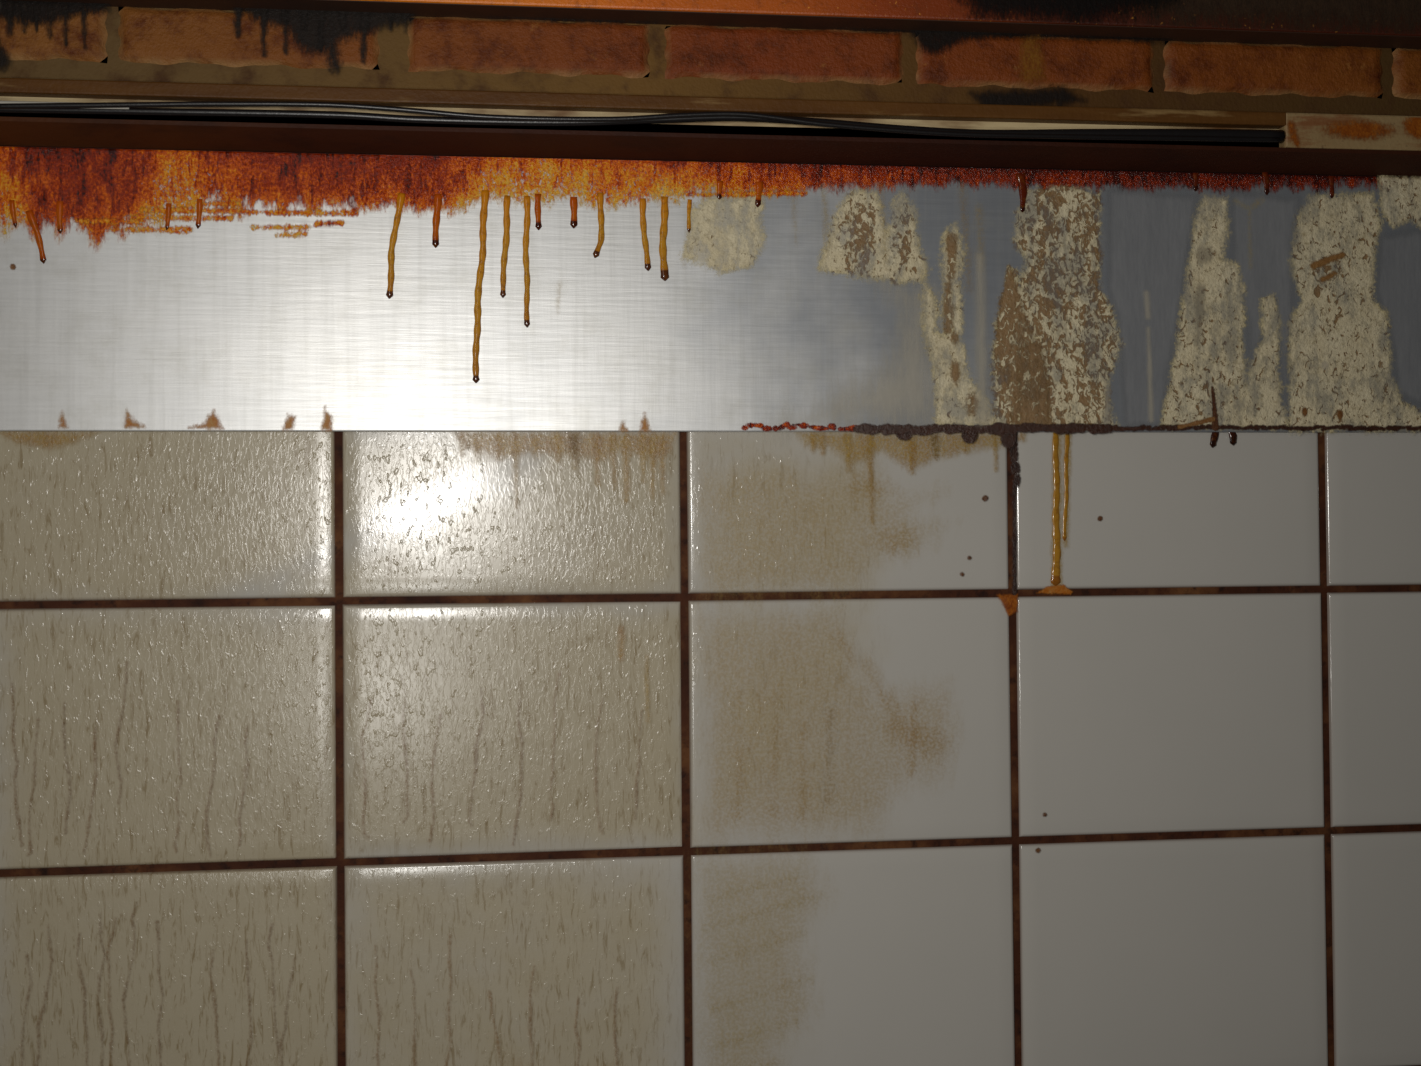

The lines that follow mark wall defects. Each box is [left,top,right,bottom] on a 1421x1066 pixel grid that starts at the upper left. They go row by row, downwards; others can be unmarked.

rust [0,146,1420,383]
peeling [683,195,766,273]
peeling [818,186,1120,426]
peeling [1160,175,1421,433]
rust [742,387,1421,615]